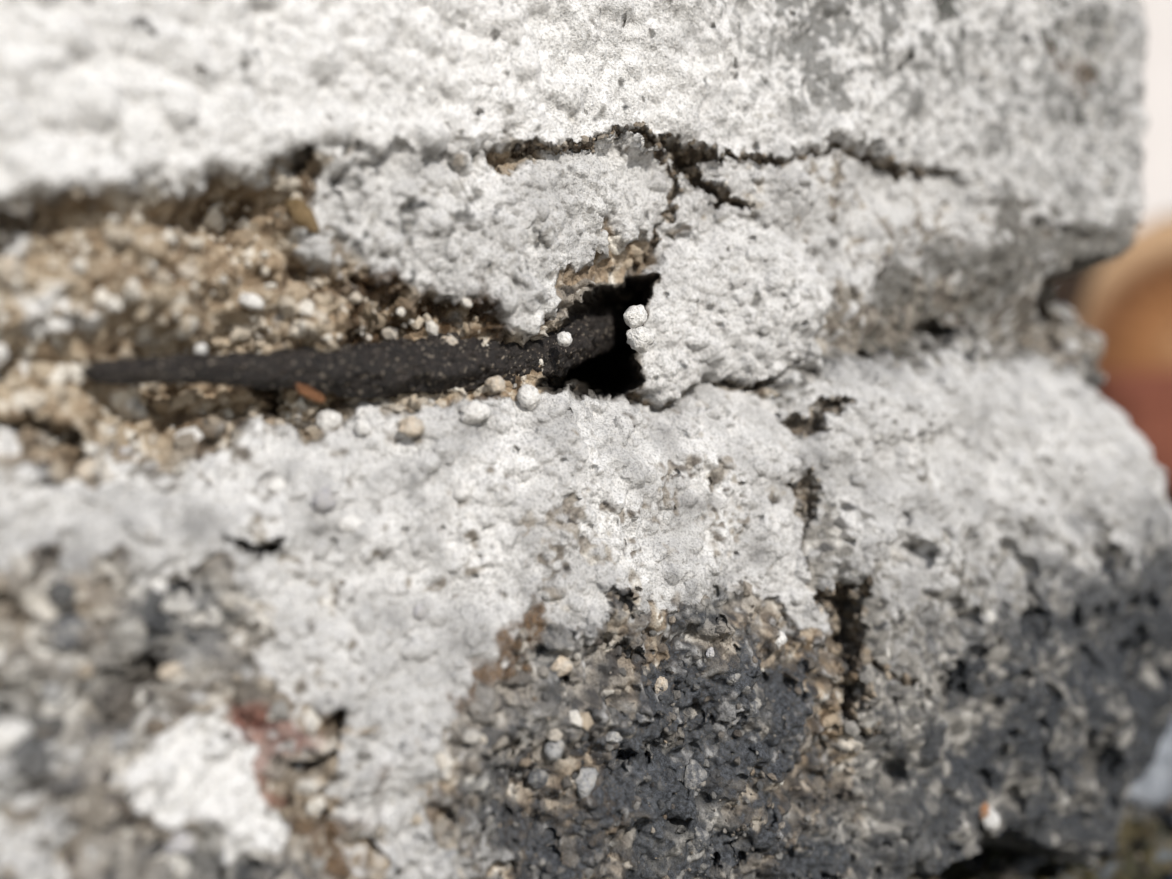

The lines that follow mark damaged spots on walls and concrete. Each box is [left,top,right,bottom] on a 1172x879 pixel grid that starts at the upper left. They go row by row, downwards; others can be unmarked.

crack [511,121,959,274]
flaking render [295,144,696,345]
peeling [0,336,872,879]
spalling [1018,598,1050,644]
spalling [941,659,972,701]
spalling [1079,730,1122,795]
spalling [979,802,1001,832]